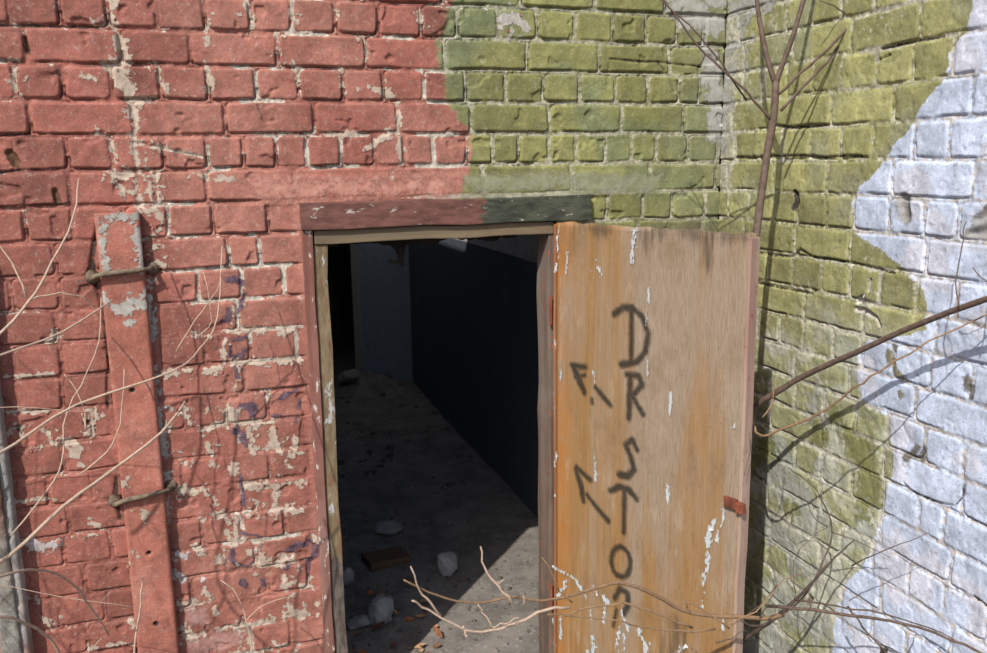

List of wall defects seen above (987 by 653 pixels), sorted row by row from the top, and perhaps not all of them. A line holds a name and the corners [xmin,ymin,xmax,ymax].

peeling [202,12,216,47]
peeling [4,36,31,100]
peeling [195,60,216,95]
peeling [271,31,301,89]
peeling [319,66,407,167]
spalling [5,149,21,167]
peeling [77,0,205,343]
peeling [3,371,56,380]
peeling [5,406,106,468]
peeling [154,302,320,653]
peeling [20,517,105,553]
peeling [86,640,127,651]